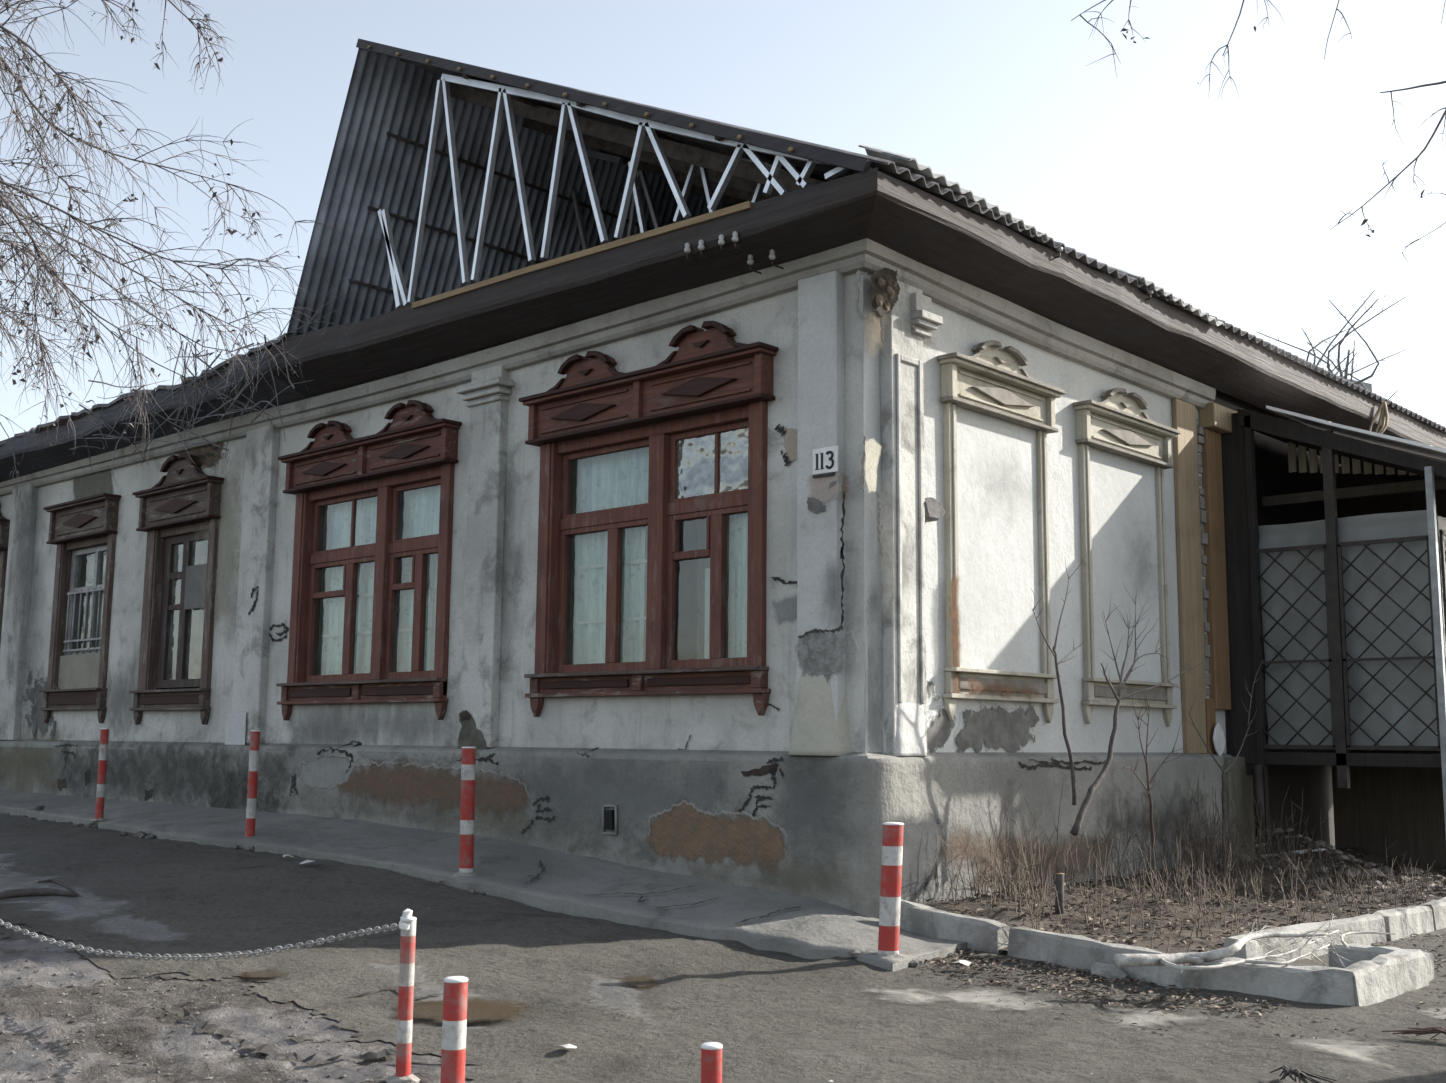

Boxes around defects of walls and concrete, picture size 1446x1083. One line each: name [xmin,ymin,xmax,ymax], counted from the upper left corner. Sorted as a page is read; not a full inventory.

peeling [807,476,841,514]
crack [798,435,883,638]
flaking render [796,630,859,682]
rust [950,578,1039,698]
flaking render [457,710,499,749]
flaking render [926,678,1040,753]
flaking render [299,754,530,819]
crack [739,756,784,817]
leakage [896,816,940,895]